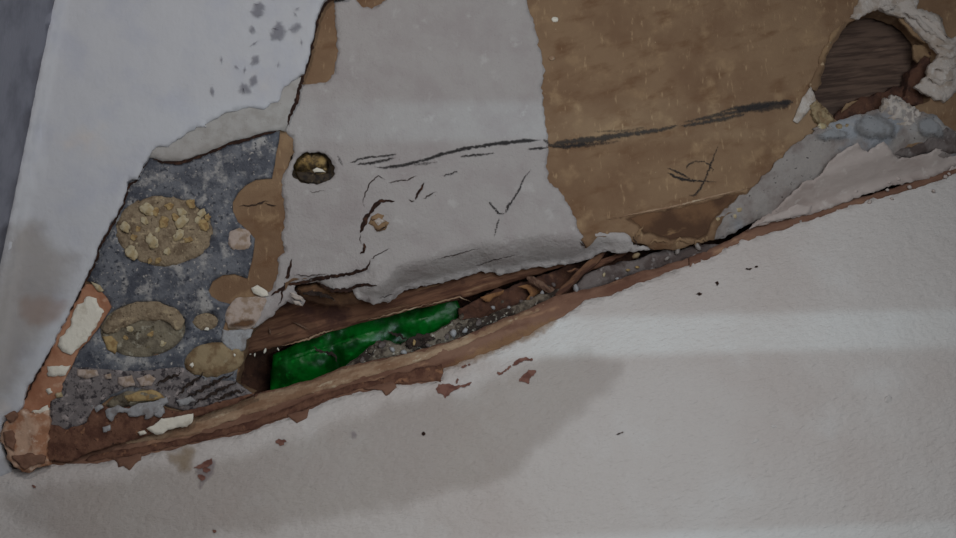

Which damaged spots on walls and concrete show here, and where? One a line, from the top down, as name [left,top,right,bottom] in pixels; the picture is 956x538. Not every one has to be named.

damp [272,23,299,38]
spalling [793,0,956,127]
crack [271,175,434,303]
flaking render [0,142,956,473]
peeling [194,459,212,481]